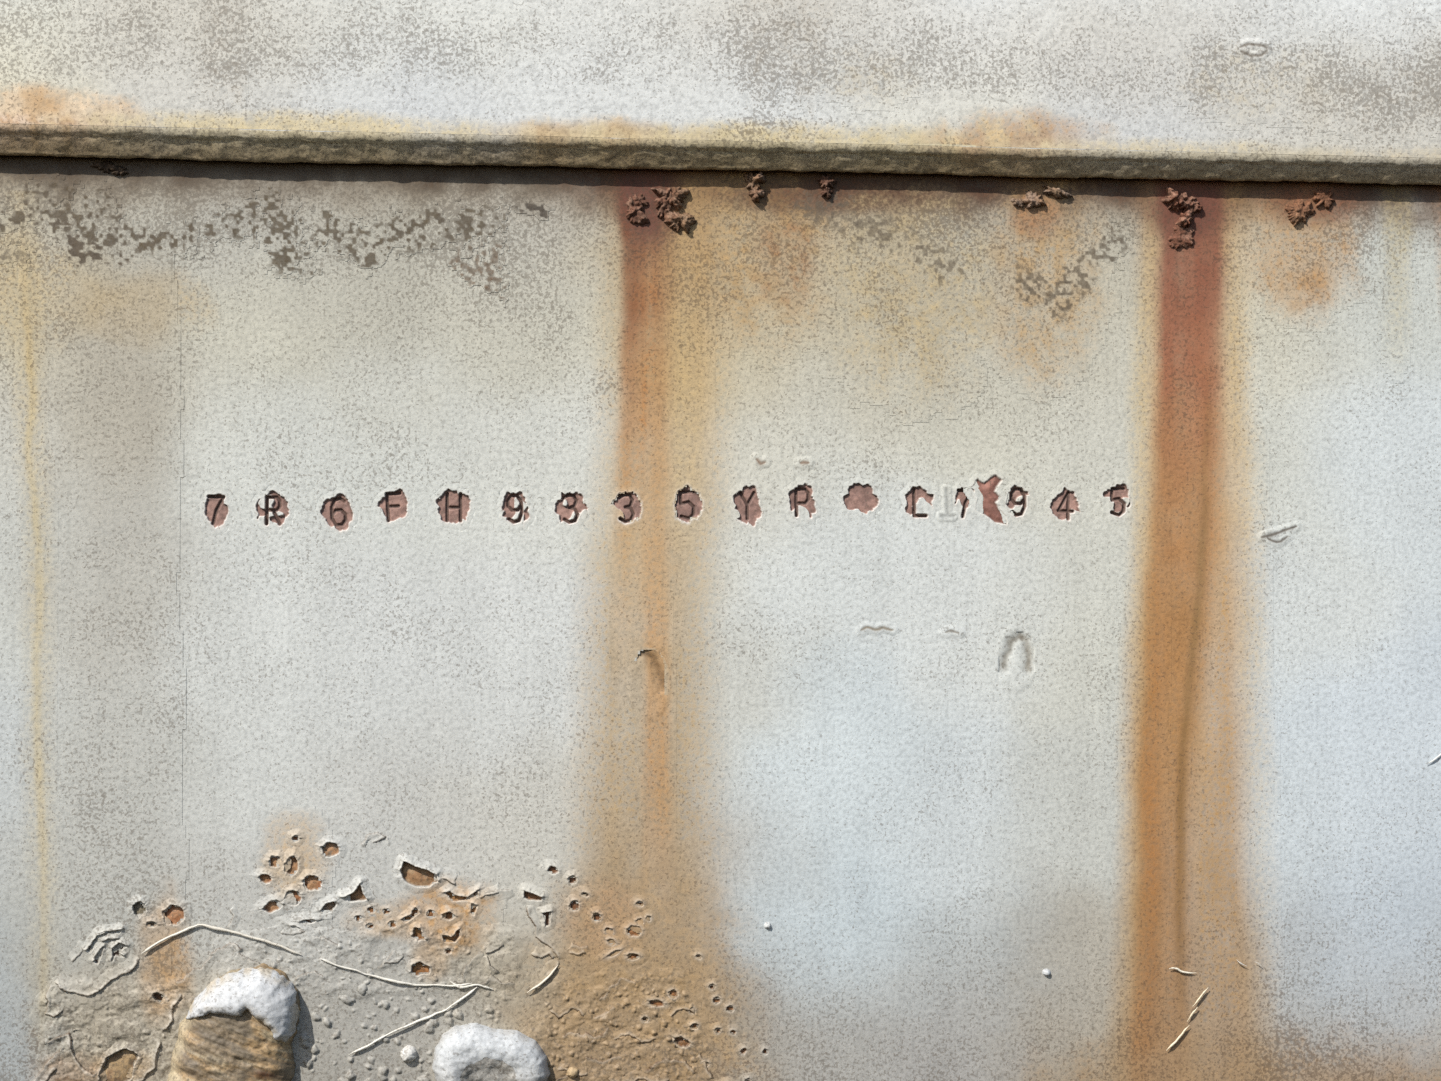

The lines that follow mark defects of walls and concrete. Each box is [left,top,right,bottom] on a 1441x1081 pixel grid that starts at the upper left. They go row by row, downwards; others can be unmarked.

mould [787,190,971,292]
mould [1001,212,1145,331]
damp [0,173,555,982]
corrosion [508,168,1441,1081]
peeling [45,893,194,1017]
peeling [29,942,242,1081]
peeling [249,828,485,980]
peeling [517,858,658,966]
peeling [637,948,775,1081]